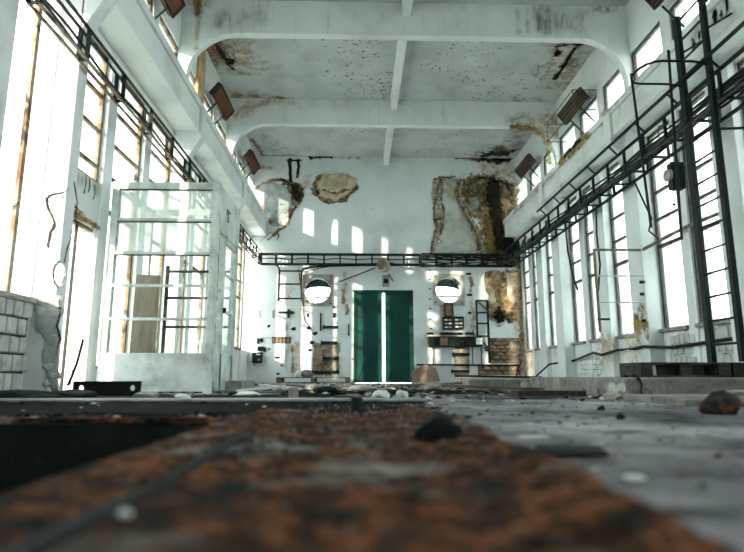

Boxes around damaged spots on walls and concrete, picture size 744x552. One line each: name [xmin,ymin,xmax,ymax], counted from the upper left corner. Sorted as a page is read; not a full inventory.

corrosion [207,41,248,67]
spalling [252,173,359,227]
spalling [429,176,488,253]
leakage [454,115,558,261]
spalling [481,269,521,327]
spalling [0,294,99,398]